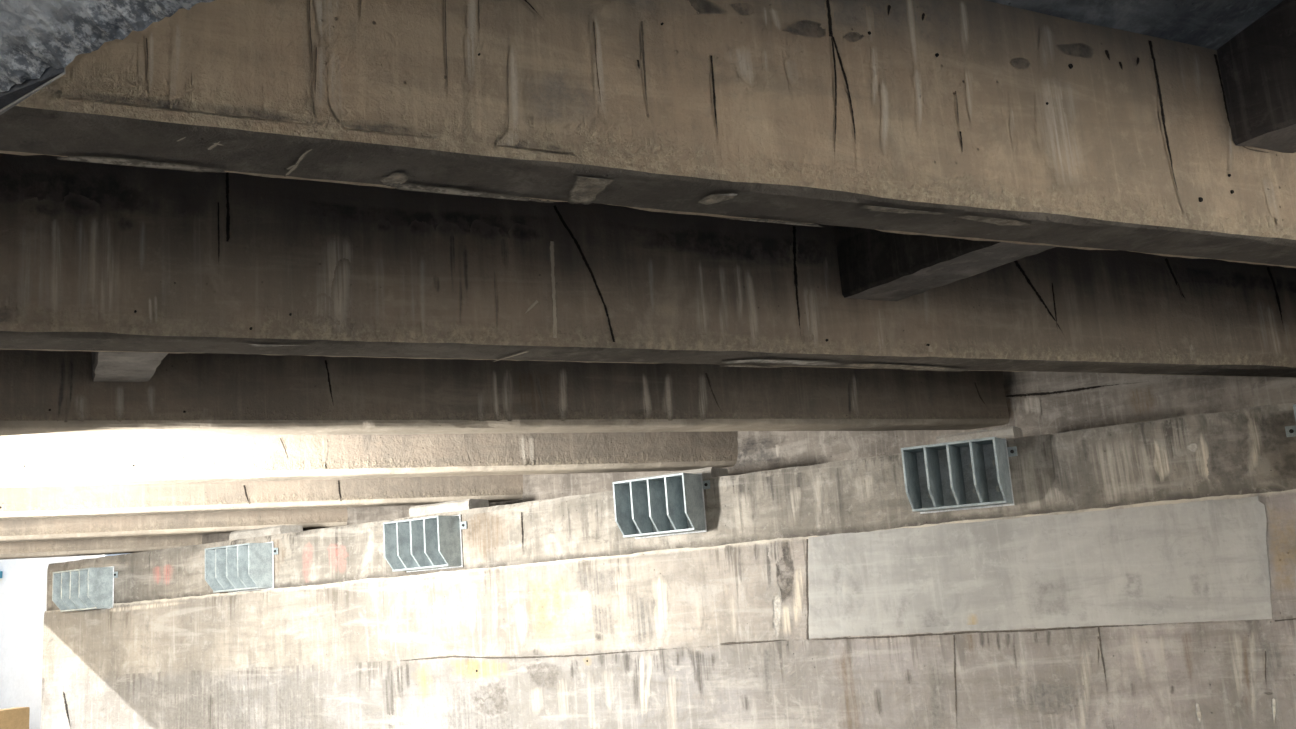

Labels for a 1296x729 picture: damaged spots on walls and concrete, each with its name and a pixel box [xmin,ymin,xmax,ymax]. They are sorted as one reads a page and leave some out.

crack [444,0,480,101]
crack [521,0,544,21]
crack [635,21,650,118]
crack [710,55,720,147]
peeling [685,0,755,16]
peeling [781,19,826,39]
crack [824,0,857,182]
crack [1146,40,1185,214]
crack [216,172,233,276]
crack [492,205,617,362]
crack [789,225,803,342]
crack [1012,259,1071,346]